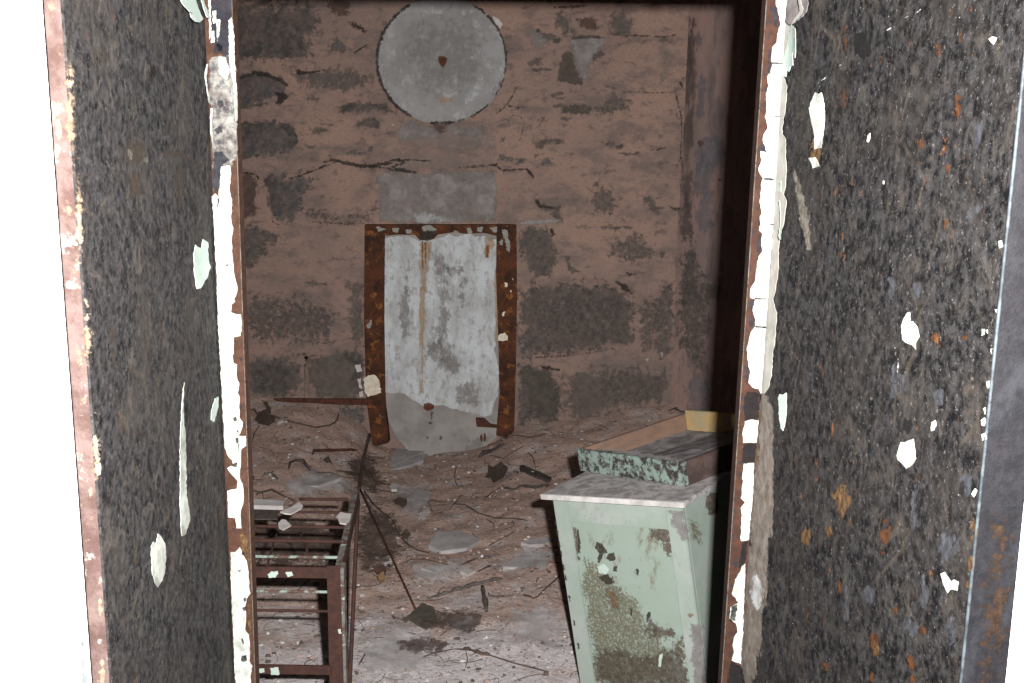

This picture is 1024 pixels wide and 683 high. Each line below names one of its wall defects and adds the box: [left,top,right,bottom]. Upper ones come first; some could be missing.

peeling [808,92,825,168]
crack [288,158,430,179]
crack [459,163,534,178]
peeling [179,0,669,536]
rust [419,230,436,424]
peeling [729,0,809,683]
peeling [901,312,920,349]
peeling [896,439,916,469]
peeling [151,534,166,587]
rust [801,526,813,545]
rust [826,485,852,537]
rust [979,511,1015,683]